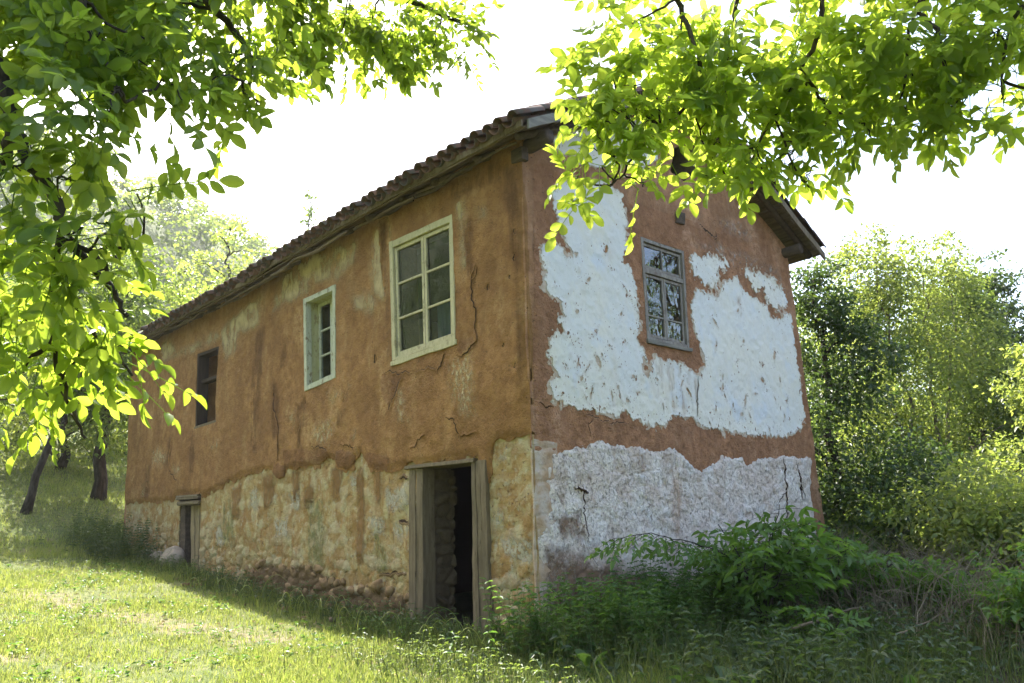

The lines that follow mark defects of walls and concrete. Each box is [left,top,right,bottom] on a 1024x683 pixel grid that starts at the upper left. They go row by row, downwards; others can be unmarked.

crack [383,264,477,410]
spalling [533,162,815,478]
crack [575,482,599,571]
crack [777,457,806,522]
spalling [244,559,409,622]